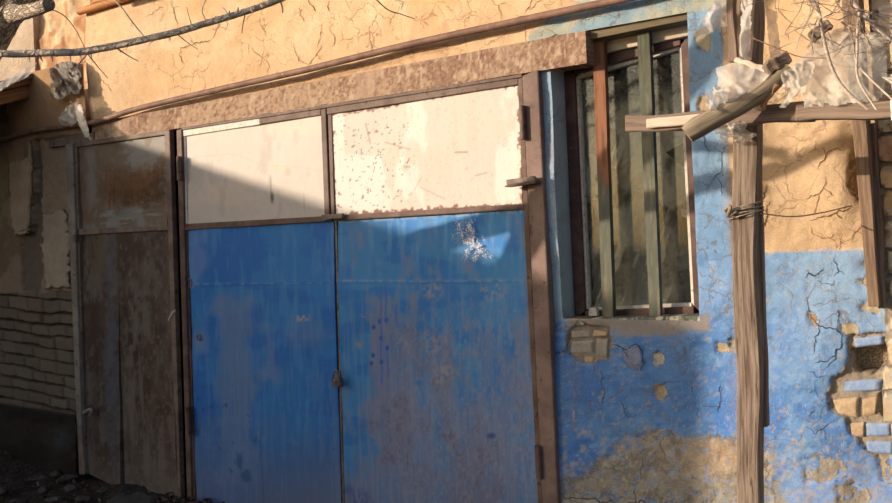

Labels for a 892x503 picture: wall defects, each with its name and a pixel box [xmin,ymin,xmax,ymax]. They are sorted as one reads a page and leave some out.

crack [122,0,270,72]
crack [293,0,352,65]
peeling [452,217,493,264]
crack [805,141,864,286]
spalling [565,322,611,363]
crack [612,343,643,362]
crack [670,374,722,412]
peeling [717,338,736,356]
crack [806,302,881,439]
spalling [827,321,892,484]
peeling [560,427,737,503]
peeling [801,450,872,503]